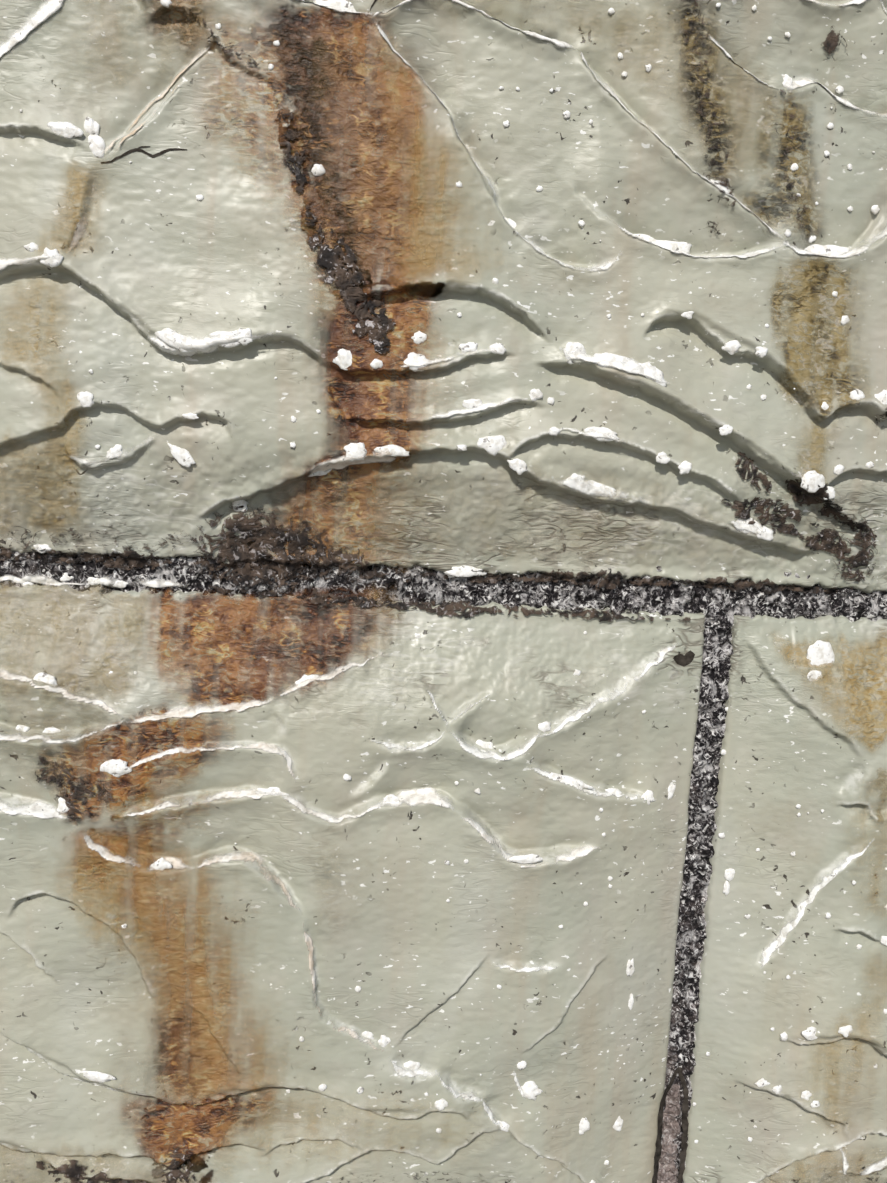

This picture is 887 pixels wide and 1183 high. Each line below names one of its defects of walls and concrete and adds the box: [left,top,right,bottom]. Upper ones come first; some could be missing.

rust [154,0,202,44]
crack [101,146,187,164]
rust [240,6,446,565]
leakage [0,451,878,695]
rust [158,588,374,711]
leakage [0,652,117,743]
leakage [134,700,269,723]
leakage [371,691,624,760]
leakage [0,743,294,823]
leakage [207,787,452,823]
rust [44,709,270,1167]
crack [652,1067,689,1183]